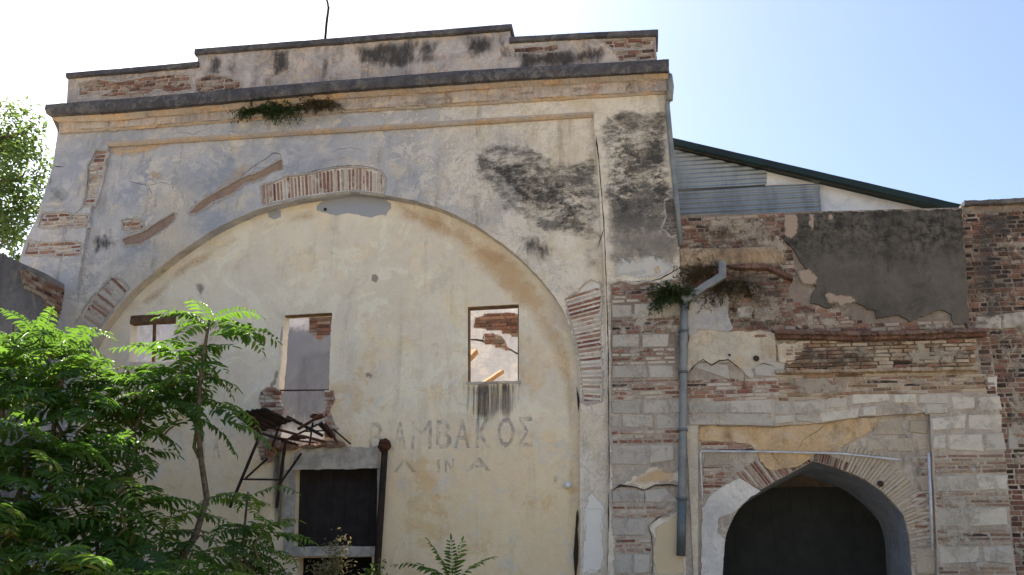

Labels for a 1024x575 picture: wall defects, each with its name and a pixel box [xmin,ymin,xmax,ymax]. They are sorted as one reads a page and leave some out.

mould [360,43,436,67]
mould [470,36,492,54]
spalling [22,148,110,258]
spalling [121,158,391,248]
water stain [478,112,675,261]
peeling [798,269,817,285]
peeling [825,293,855,306]
water stain [473,385,510,416]
flaking render [565,256,683,575]
crack [596,138,678,575]